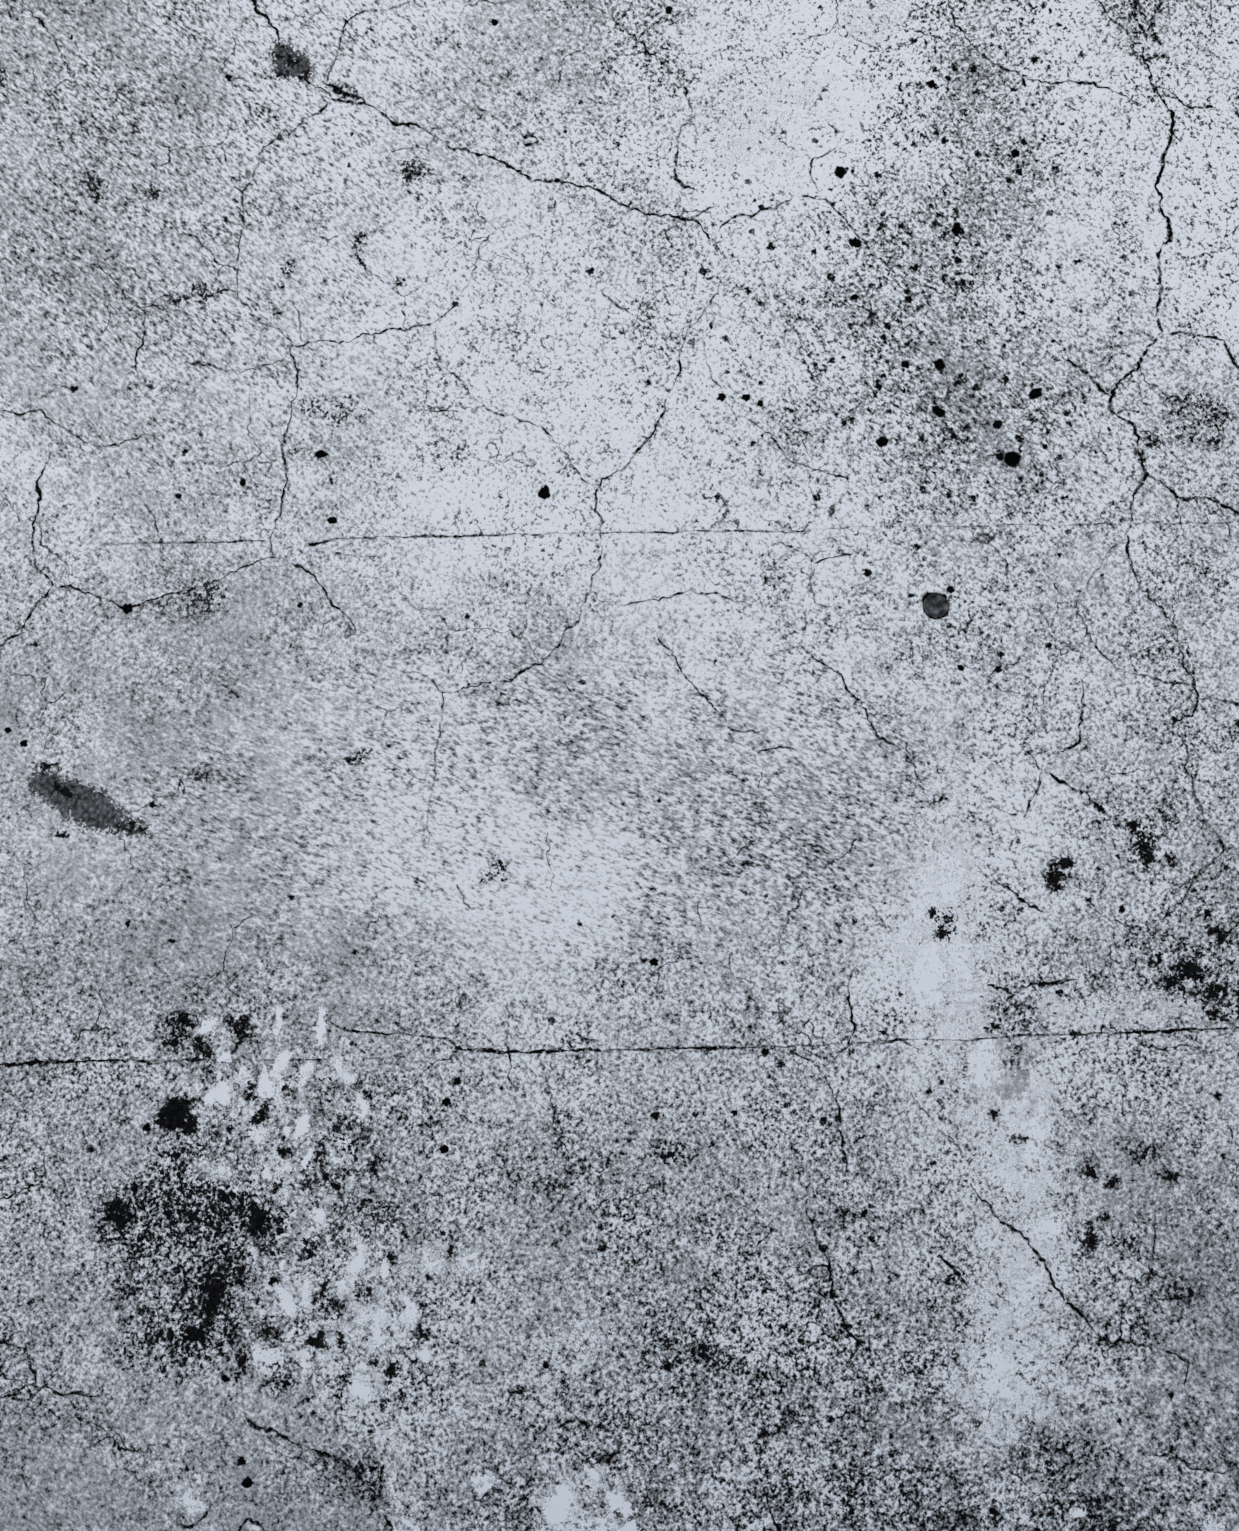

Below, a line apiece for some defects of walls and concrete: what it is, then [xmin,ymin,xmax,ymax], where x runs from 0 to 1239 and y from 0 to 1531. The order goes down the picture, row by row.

water stain [269,37,360,103]
crack [0,0,942,842]
crack [948,0,1239,928]
water stain [19,762,152,840]
crack [788,968,919,1174]
crack [987,958,1076,1032]
crack [0,1340,97,1422]
water stain [91,1010,496,1399]
water stain [379,1355,402,1414]
water stain [503,1289,722,1401]
crack [787,1210,860,1368]
crack [910,1093,1190,1387]